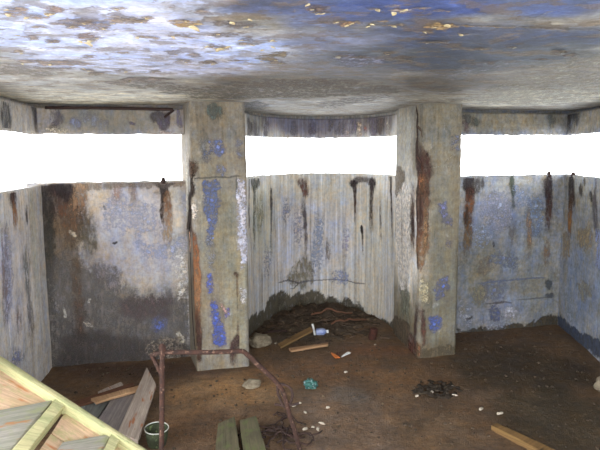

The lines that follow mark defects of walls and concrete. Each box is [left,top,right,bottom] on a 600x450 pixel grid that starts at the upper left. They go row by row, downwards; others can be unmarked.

water stain [39,185,190,367]
corrosion [155,182,174,241]
corrosion [190,225,202,362]
corrosion [410,144,432,270]
corrosion [463,178,485,253]
corrosion [543,176,553,229]